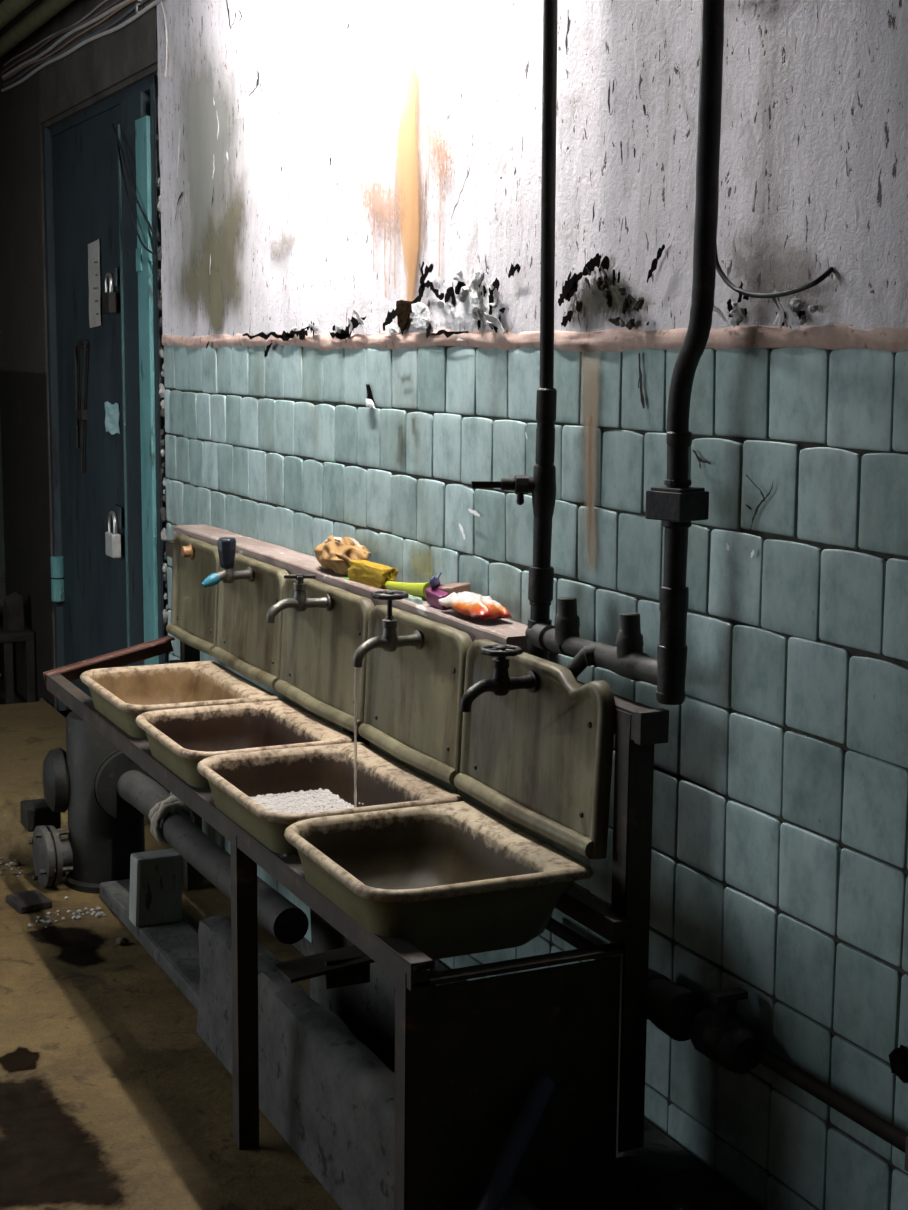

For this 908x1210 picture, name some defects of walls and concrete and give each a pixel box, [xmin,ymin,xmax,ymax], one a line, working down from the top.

corrosion [356,34,455,302]
flaking render [243,309,367,341]
flaking render [383,261,521,338]
flaking render [713,281,749,328]
flaking render [772,291,818,329]
corrosion [583,359,598,569]
water stain [0,1047,124,1210]